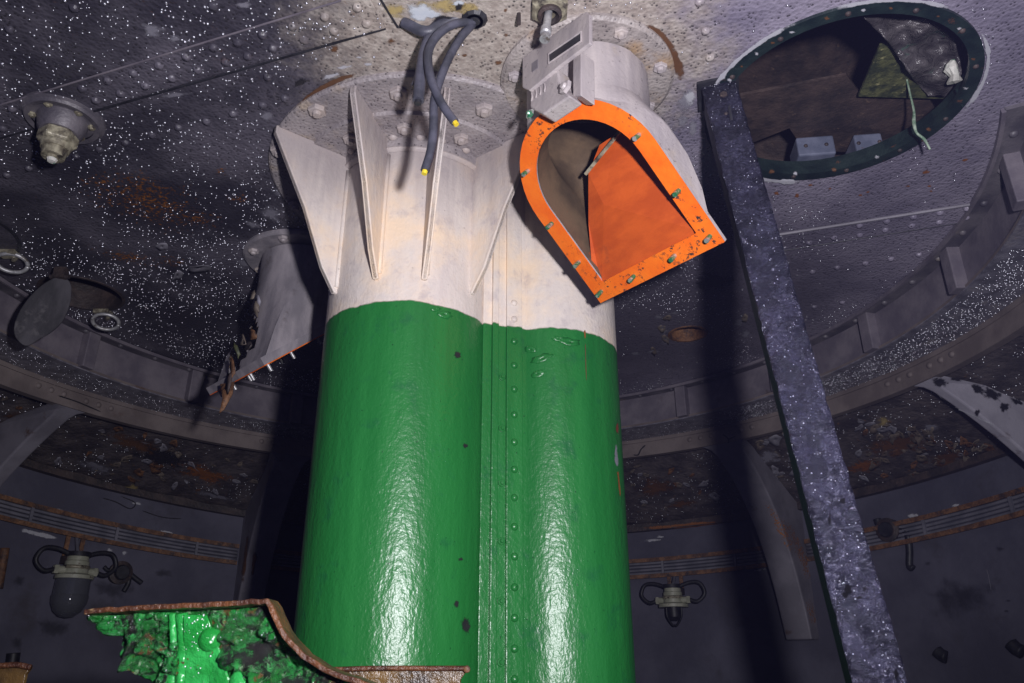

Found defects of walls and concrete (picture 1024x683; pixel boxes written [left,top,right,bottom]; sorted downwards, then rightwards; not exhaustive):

rust [648,26,684,78]
peeling [972,384,1023,412]